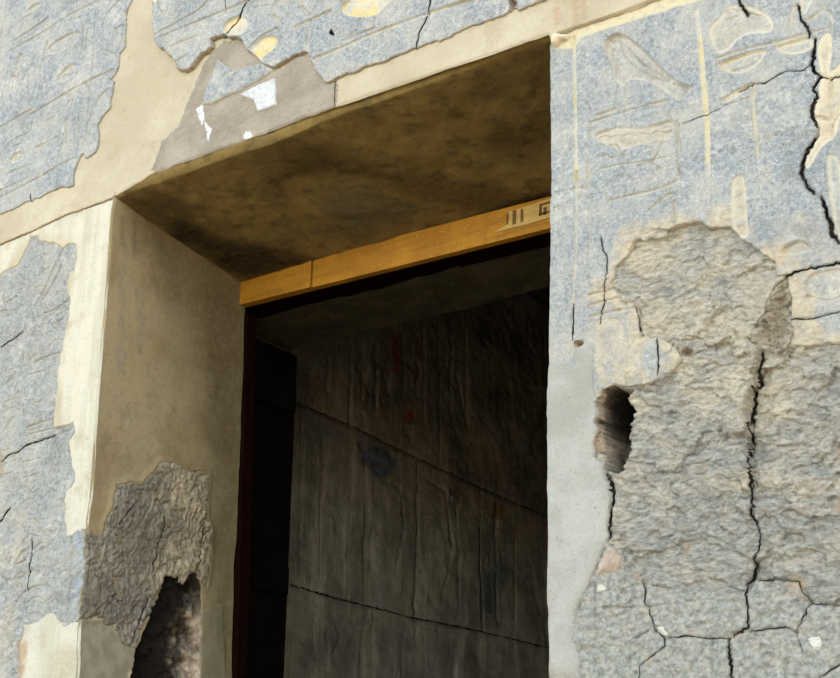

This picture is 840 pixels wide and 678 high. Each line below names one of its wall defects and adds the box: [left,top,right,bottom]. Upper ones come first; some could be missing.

crack [225,0,249,38]
crack [416,0,431,49]
crack [739,5,840,278]
spalling [594,224,840,607]
crack [607,474,615,539]
crack [638,352,840,678]
spalling [130,572,202,678]
peeling [808,637,823,650]